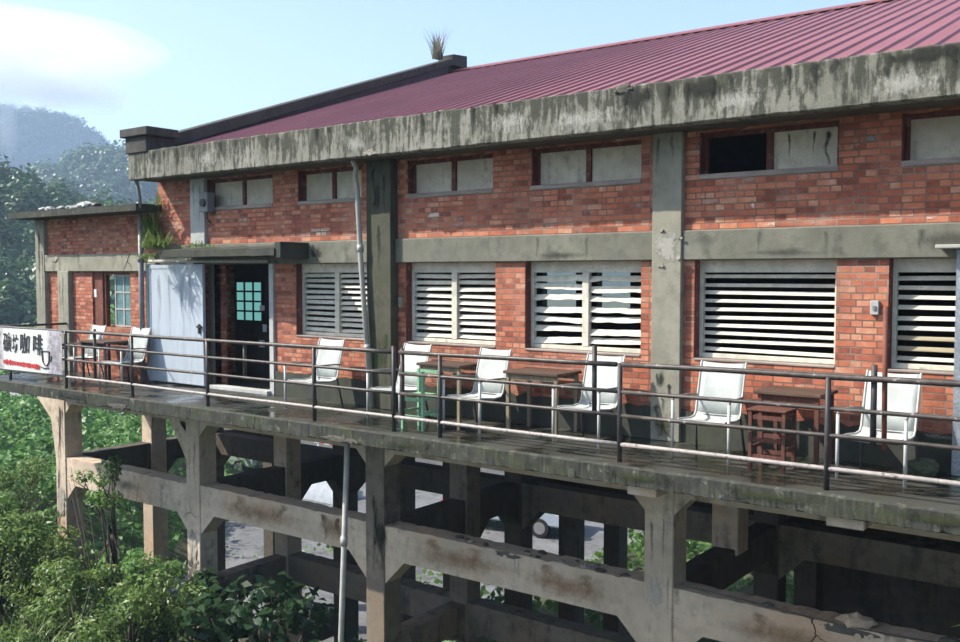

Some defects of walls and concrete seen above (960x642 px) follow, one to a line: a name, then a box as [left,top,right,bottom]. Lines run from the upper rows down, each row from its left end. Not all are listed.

damp [884,45,957,92]
damp [622,86,651,114]
damp [684,75,753,114]
damp [493,103,523,132]
damp [560,107,610,125]
peeling [654,229,683,268]
spalling [819,623,881,640]